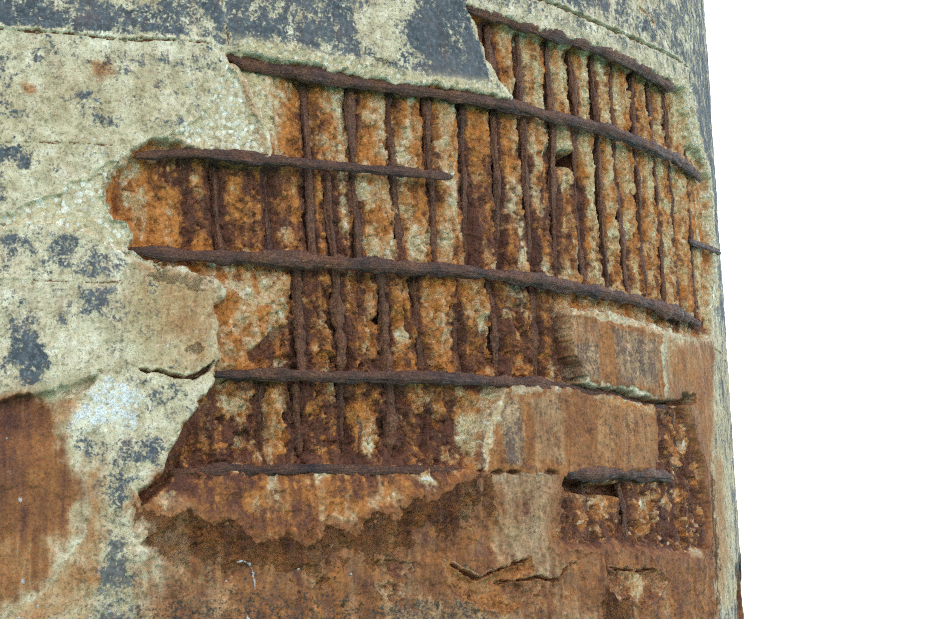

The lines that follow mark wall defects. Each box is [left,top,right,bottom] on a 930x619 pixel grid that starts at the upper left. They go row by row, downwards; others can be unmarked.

rust [127,256,224,384]
crack [137,357,216,381]
spalling [0,0,719,619]
rust [3,332,731,619]
crack [441,556,581,584]